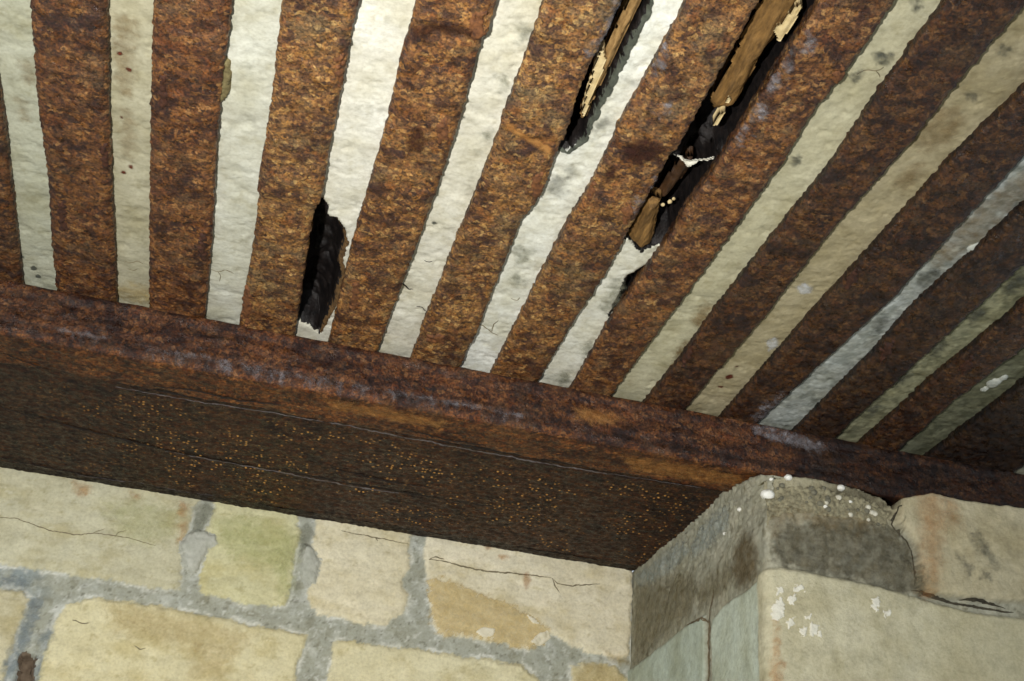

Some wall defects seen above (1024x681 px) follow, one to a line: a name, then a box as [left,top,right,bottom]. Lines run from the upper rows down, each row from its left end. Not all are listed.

rust [507,124,551,153]
rust [586,168,615,202]
spalling [558,0,653,154]
rust [626,140,665,165]
spalling [624,0,815,253]
rust [241,285,254,328]
hole [298,196,349,334]
crack [0,406,566,519]
crack [116,382,725,492]
crack [0,458,610,593]
leakage [772,517,924,596]
crack [891,505,1014,613]